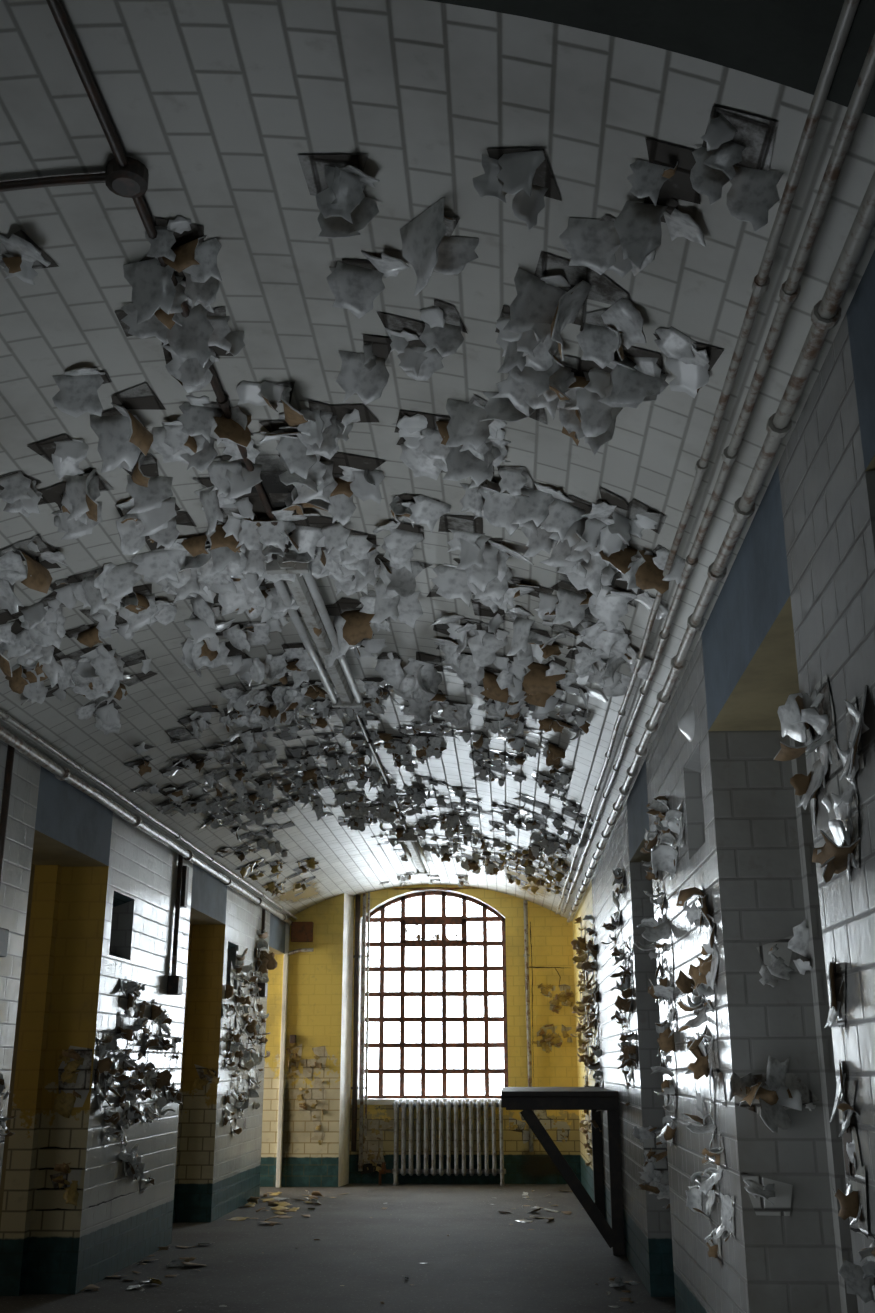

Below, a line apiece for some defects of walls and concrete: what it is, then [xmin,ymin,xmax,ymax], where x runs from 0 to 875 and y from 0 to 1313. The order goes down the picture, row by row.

peeling [0,106,783,897]
peeling [774,675,869,883]
peeling [0,1073,17,1143]
peeling [52,915,277,1194]
peeling [286,1043,328,1145]
spalling [509,1110,604,1167]
peeling [532,795,875,1303]